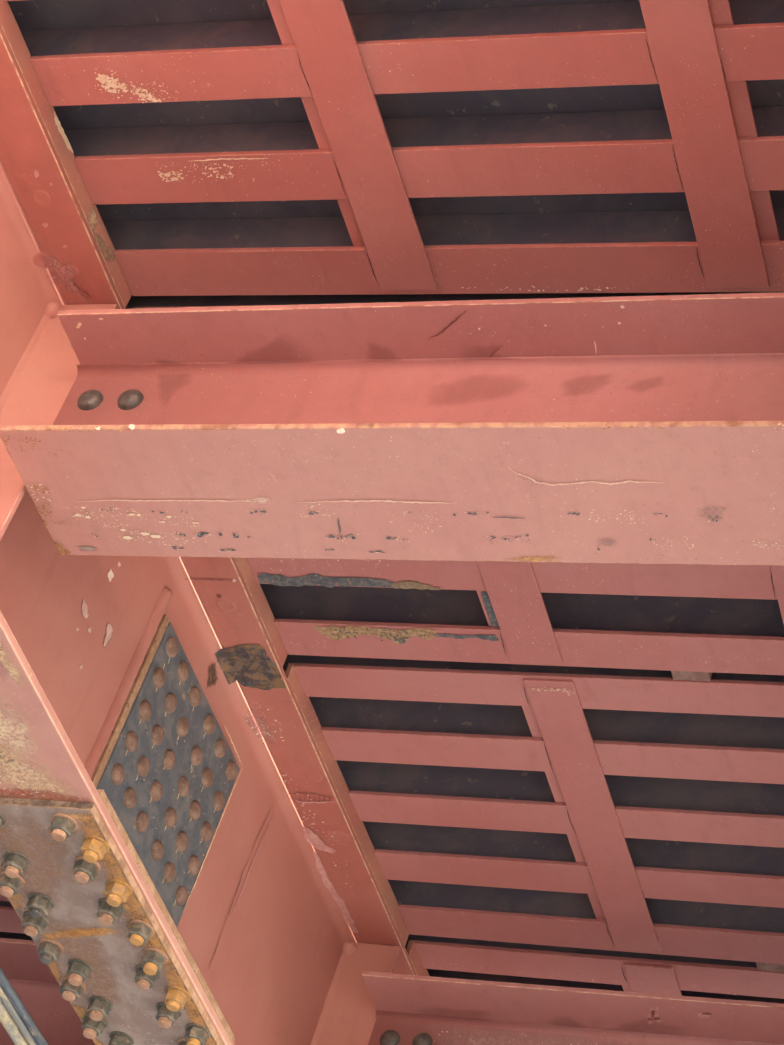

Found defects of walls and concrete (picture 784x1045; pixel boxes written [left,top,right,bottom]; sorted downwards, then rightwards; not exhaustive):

peeling [66,505,252,552]
peeling [300,500,359,561]
peeling [258,558,440,590]
peeling [290,592,499,648]
peeling [207,644,286,690]
rust [0,793,216,1045]